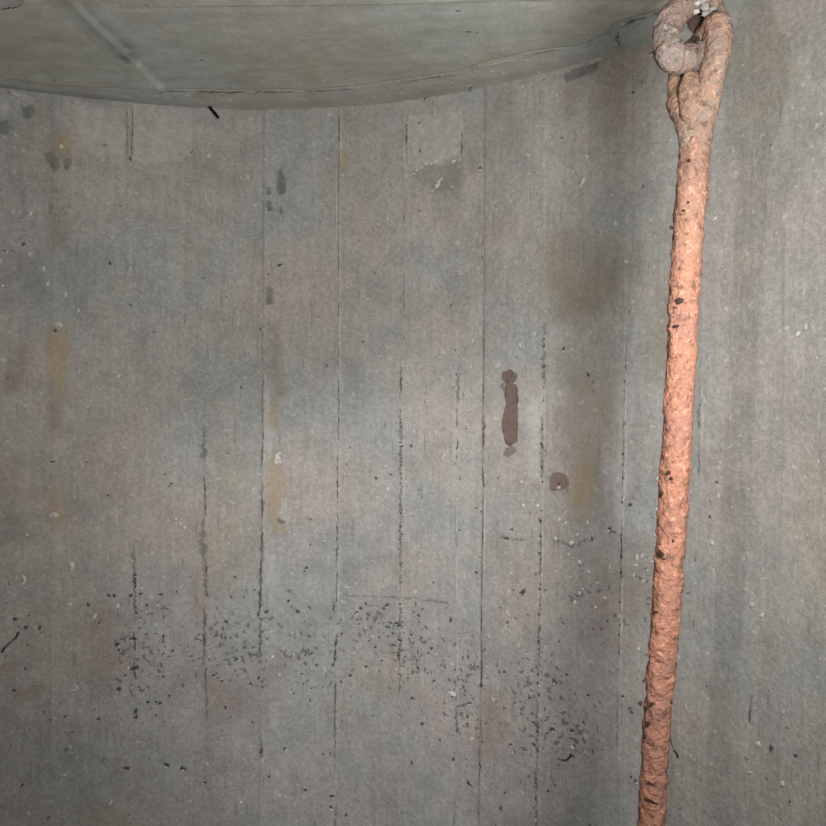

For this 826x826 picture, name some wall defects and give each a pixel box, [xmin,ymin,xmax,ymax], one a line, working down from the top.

corrosion [549,472,569,493]